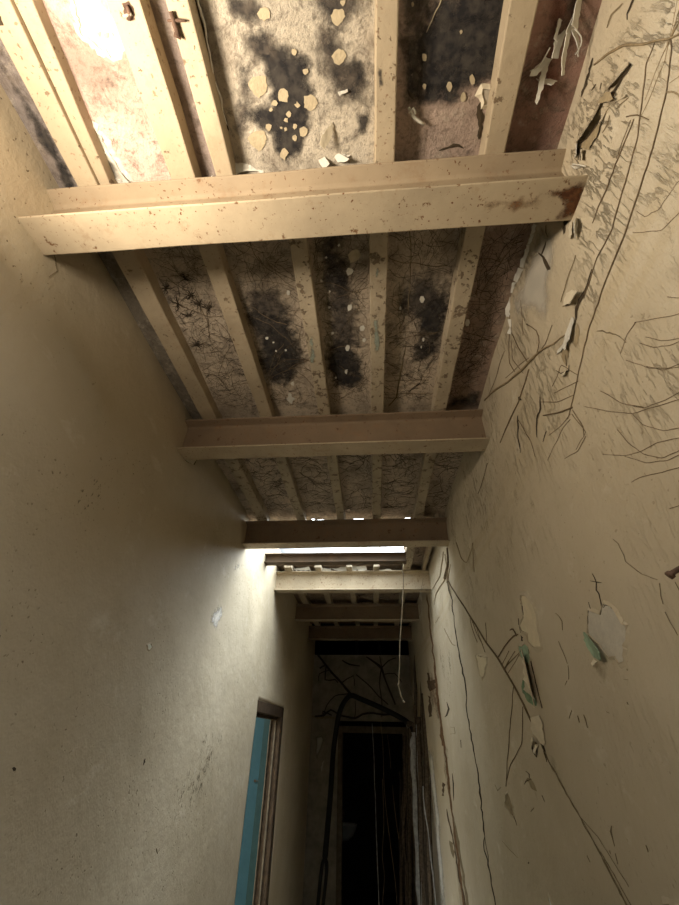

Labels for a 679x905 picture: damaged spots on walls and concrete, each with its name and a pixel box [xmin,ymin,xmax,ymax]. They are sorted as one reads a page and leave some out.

peeling [70,0,125,62]
water stain [228,0,270,24]
water stain [236,32,318,160]
water stain [317,0,365,102]
water stain [403,0,504,126]
peeling [530,0,583,104]
crack [581,58,601,97]
crack [606,0,634,28]
corrosion [552,185,584,219]
flaking render [505,224,552,334]
spalling [583,574,630,669]
crack [426,580,496,905]